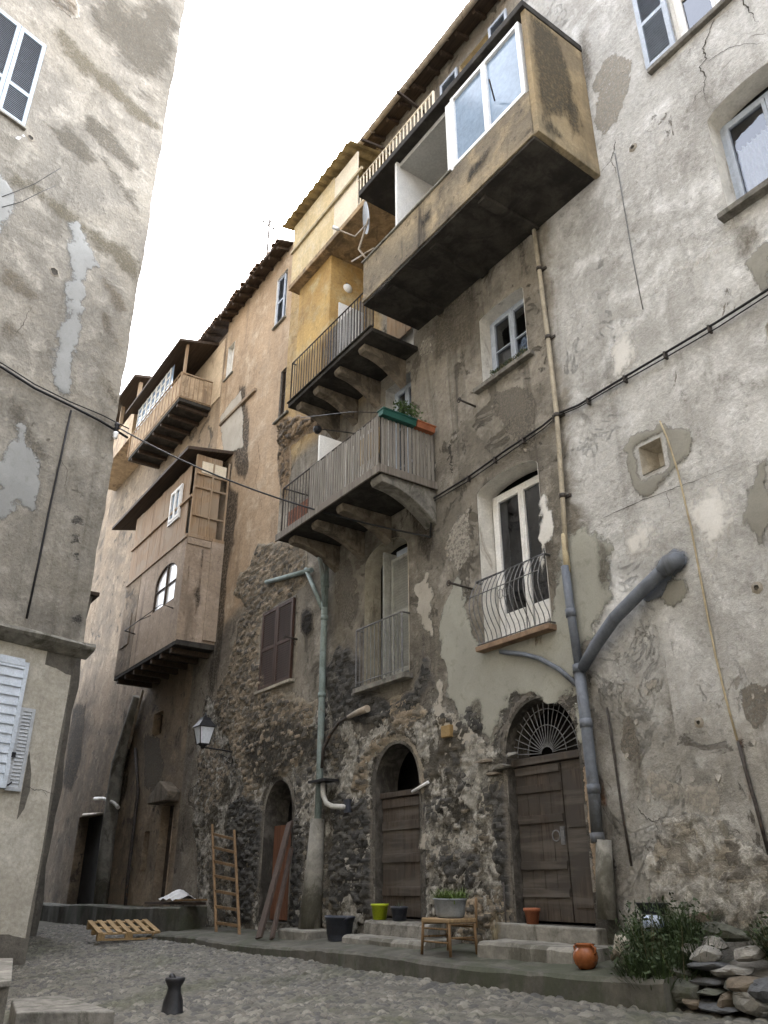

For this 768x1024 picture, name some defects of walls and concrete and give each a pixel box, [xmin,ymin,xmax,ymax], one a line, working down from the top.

water stain [531,16,579,137]
flaking render [592,54,632,135]
crack [693,0,764,112]
flaking render [491,385,540,453]
spalling [300,607,314,639]
flaking render [740,683,768,745]
flaking render [192,691,534,945]